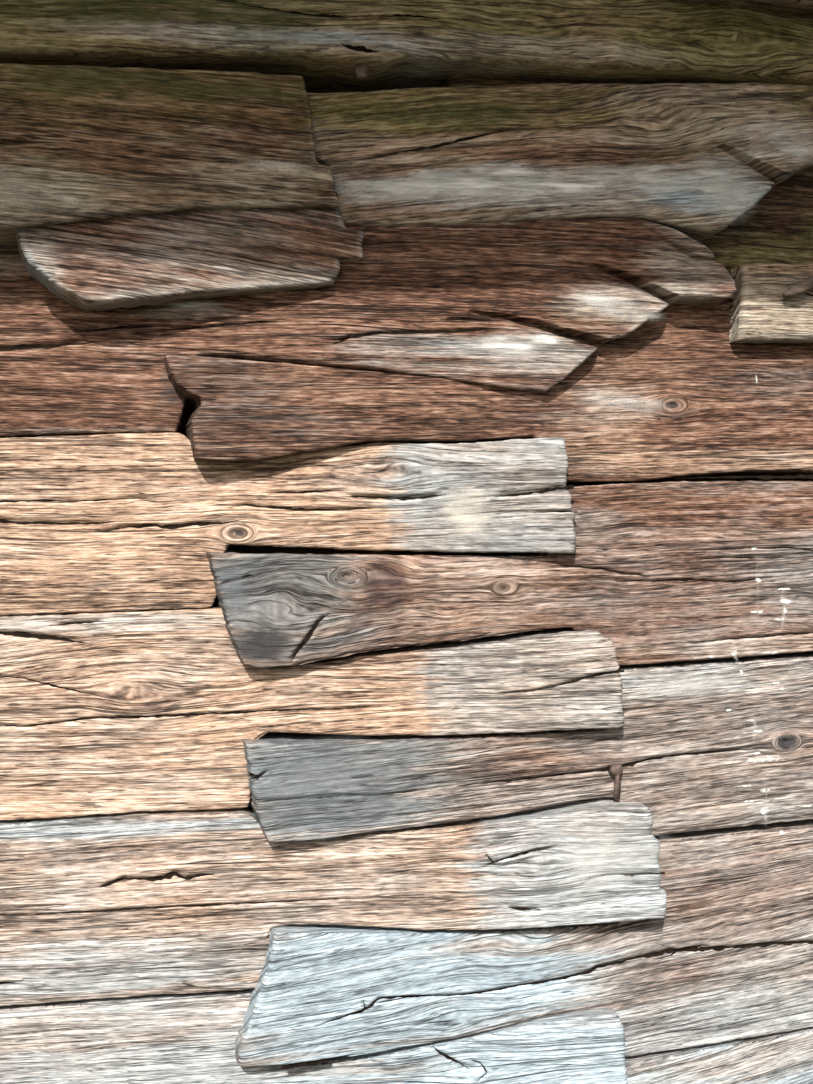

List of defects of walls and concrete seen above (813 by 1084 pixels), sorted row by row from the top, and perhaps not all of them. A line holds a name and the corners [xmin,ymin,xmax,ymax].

crack [290,614,329,662]
crack [4,872,394,916]
crack [315,941,813,1027]
crack [430,1046,487,1081]